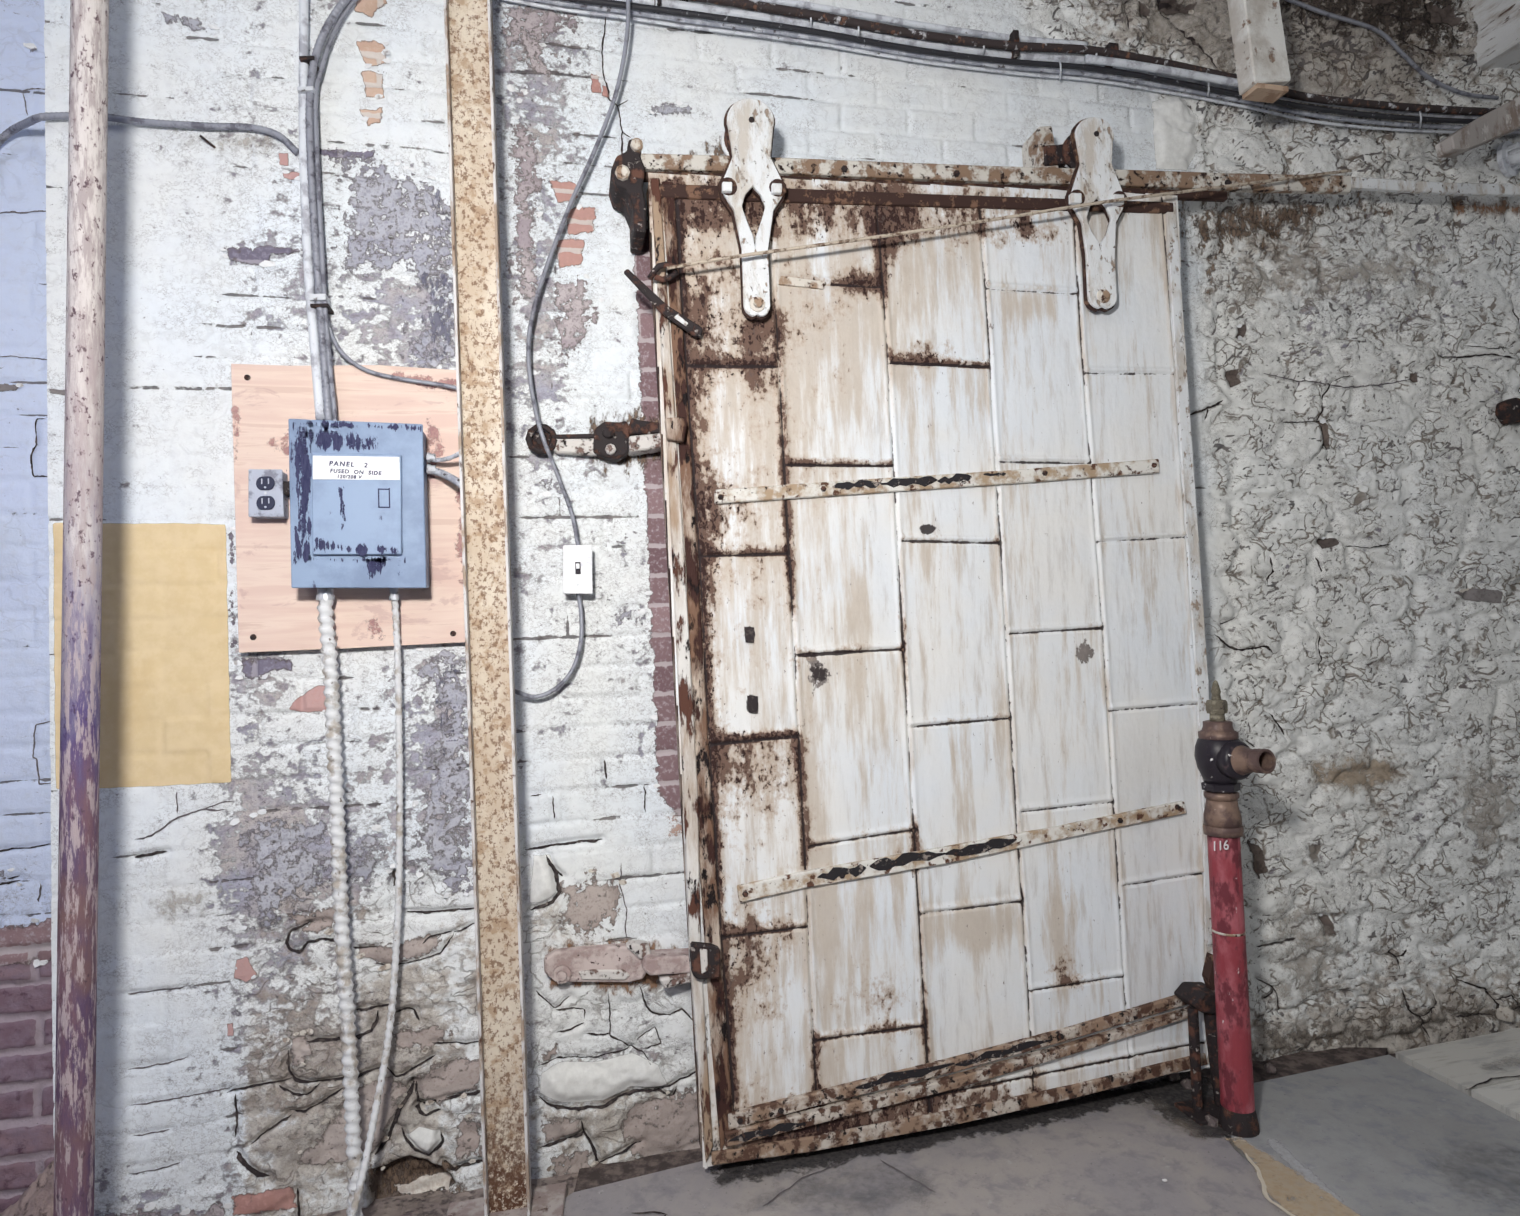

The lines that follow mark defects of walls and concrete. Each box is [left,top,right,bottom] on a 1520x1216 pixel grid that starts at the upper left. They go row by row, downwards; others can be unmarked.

rust [690,137,726,156]
peeling [314,143,455,369]
crack [1440,297,1520,393]
crack [1190,400,1223,420]
crack [1264,373,1412,465]
crack [1214,617,1272,652]
peeling [229,646,474,982]
crack [285,907,475,965]
spalling [546,868,627,941]
crack [128,1003,483,1216]
spalling [297,1025,482,1200]
peeling [105,1186,298,1216]